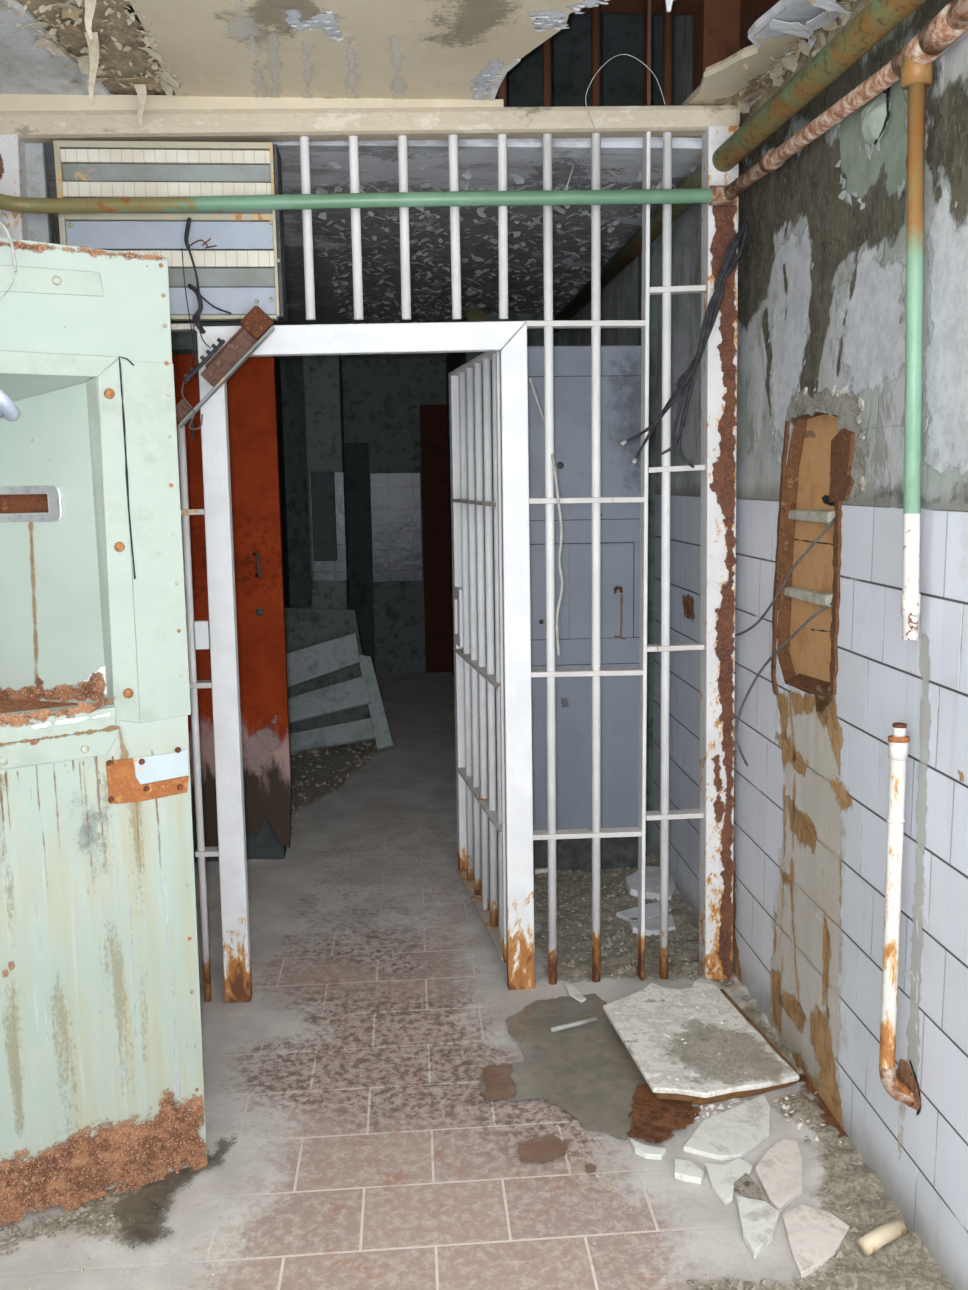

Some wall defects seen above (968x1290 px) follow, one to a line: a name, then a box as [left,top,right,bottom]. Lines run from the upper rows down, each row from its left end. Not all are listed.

peeling [0,0,191,128]
peeling [471,59,504,100]
peeling [833,79,908,210]
peeling [768,221,906,504]
peeling [921,185,968,476]
rust [0,522,128,829]
rust [709,204,741,983]
rust [770,420,852,1138]
rust [0,1089,208,1228]
rust [627,1084,701,1144]